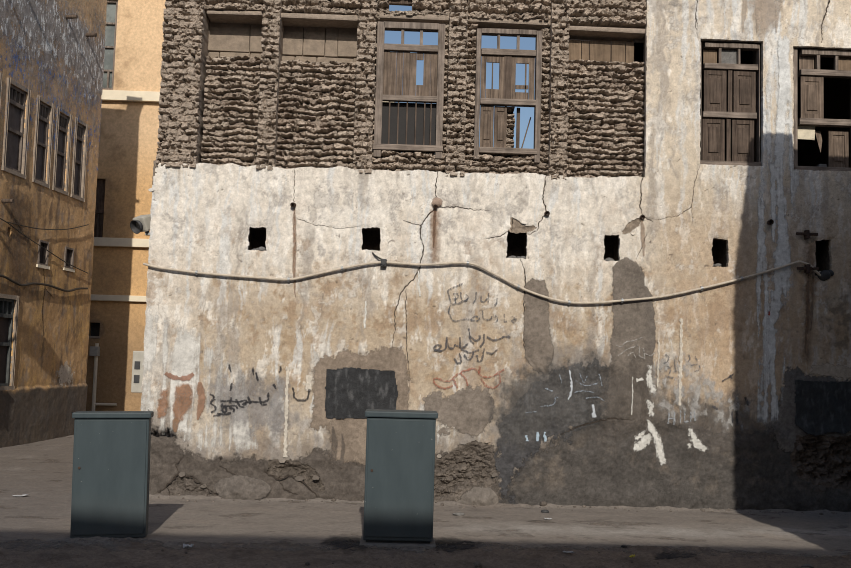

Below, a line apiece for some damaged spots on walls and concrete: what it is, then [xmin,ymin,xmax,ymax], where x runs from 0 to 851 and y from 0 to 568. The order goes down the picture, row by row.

crack [392,170,486,387]
flaking render [508,217,537,234]
flaking render [622,217,641,235]
leakage [473,0,851,512]
crack [637,169,699,257]
rust [805,245,814,361]
leakage [140,307,365,501]
flaking render [167,472,218,496]
flaking render [267,458,325,492]
flaking render [434,440,498,502]